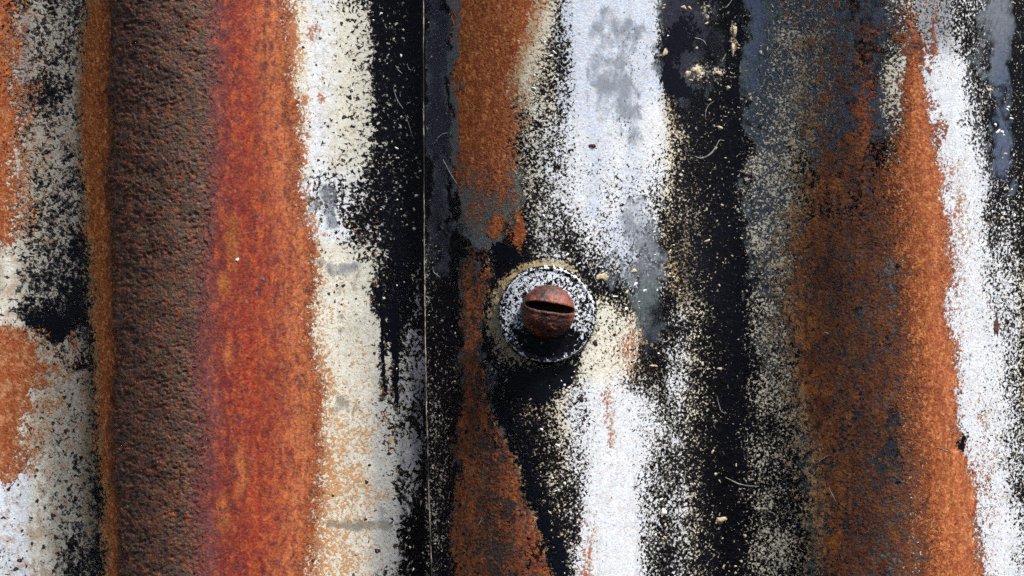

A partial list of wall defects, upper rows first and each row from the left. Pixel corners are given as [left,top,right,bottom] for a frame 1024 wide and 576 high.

rust [0,0,417,576]
rust [442,0,609,576]
rust [757,0,1014,576]